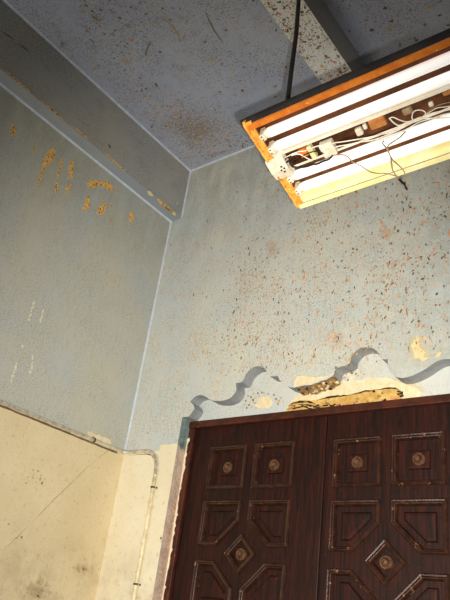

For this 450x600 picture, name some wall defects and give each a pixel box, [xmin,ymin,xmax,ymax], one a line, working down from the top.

peeling [37,147,74,196]
peeling [82,179,119,223]
peeling [191,158,450,411]